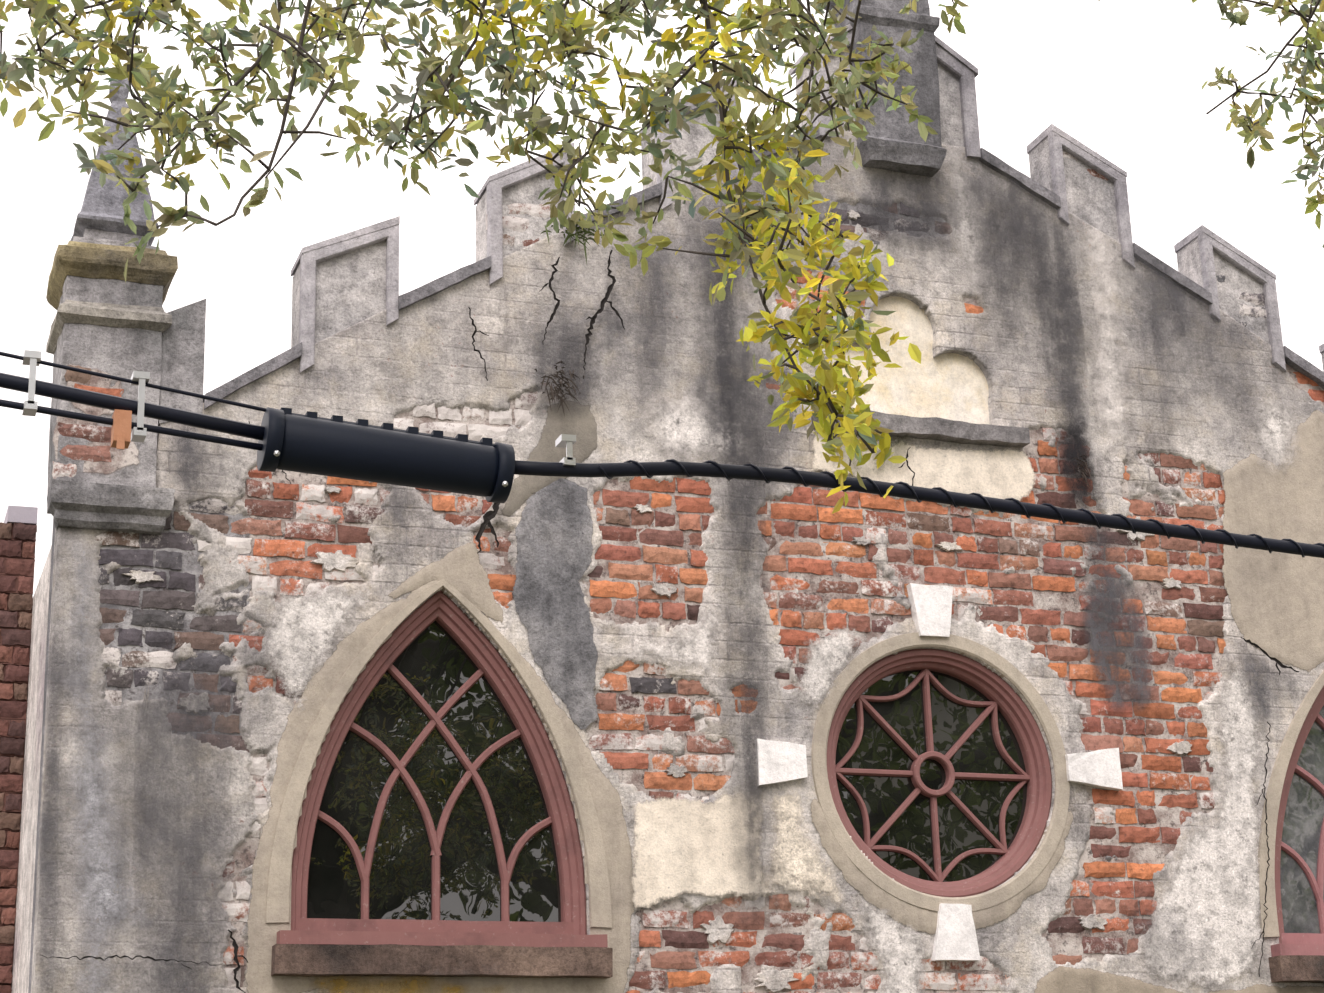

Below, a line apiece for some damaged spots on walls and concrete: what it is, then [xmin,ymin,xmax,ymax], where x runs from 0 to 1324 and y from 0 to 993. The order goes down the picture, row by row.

crack [539,250,625,370]
leakage [977,183,1082,429]
flaking render [393,391,538,441]
flaking render [415,488,516,608]
flaking render [582,476,714,632]
flaking render [95,466,390,987]
flaking render [586,660,758,802]
flaking render [755,426,1229,965]
crack [1241,637,1299,675]
crack [1251,722,1271,977]
crack [41,929,248,993]
flaking render [626,894,881,993]